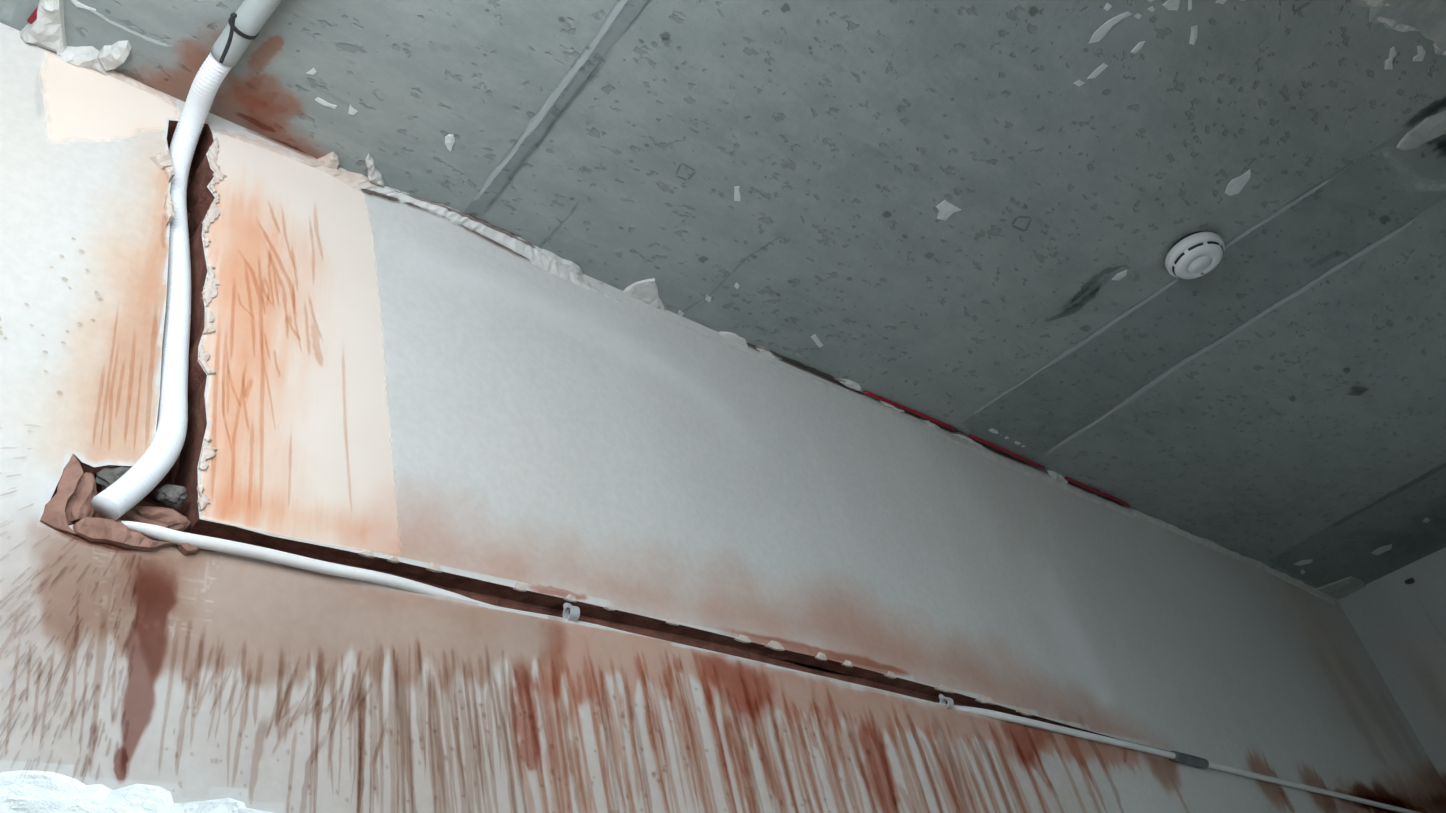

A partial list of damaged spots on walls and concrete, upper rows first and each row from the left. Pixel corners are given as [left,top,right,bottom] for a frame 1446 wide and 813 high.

peeling [20,0,131,76]
peeling [1089,0,1198,45]
flaking render [1364,0,1446,70]
peeling [1073,63,1108,87]
spalling [1408,98,1446,126]
peeling [73,517,198,555]